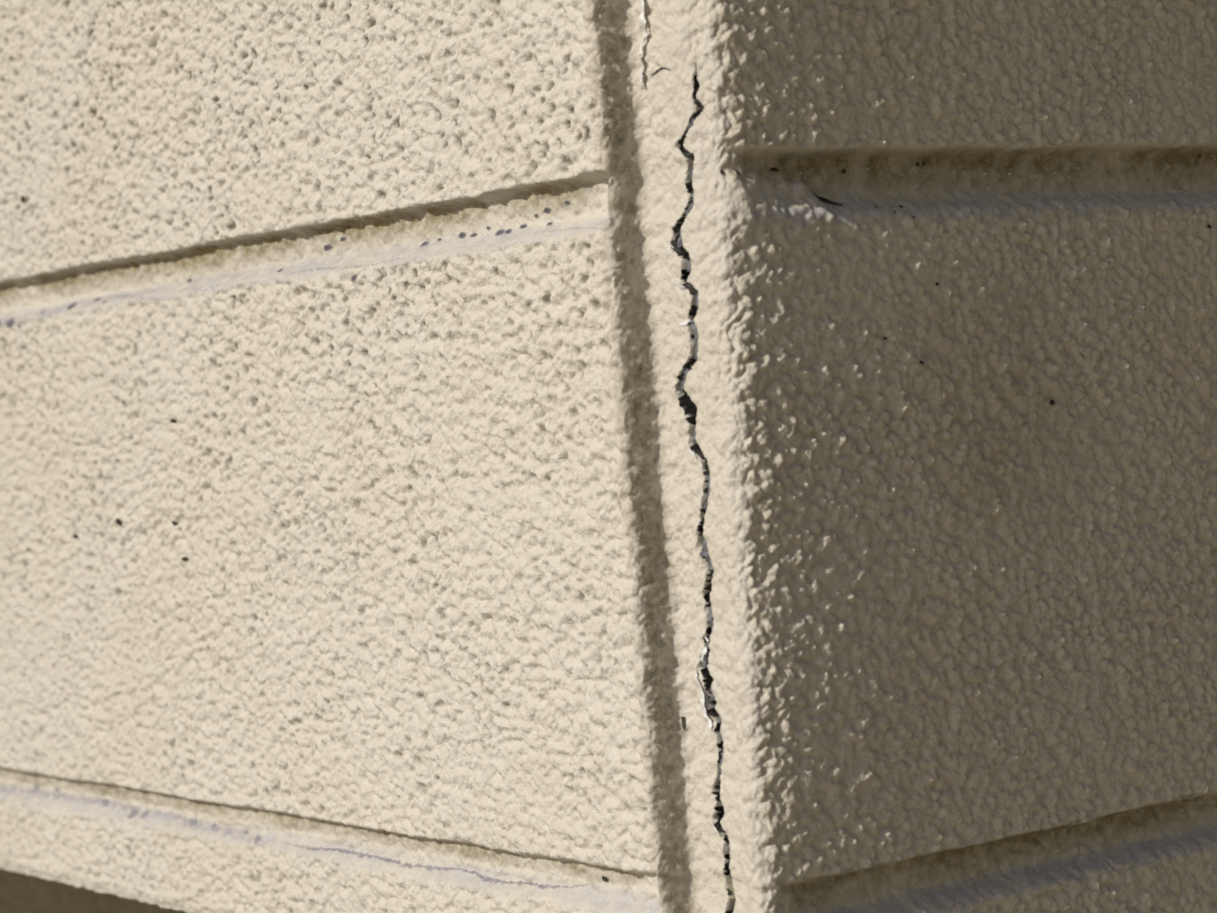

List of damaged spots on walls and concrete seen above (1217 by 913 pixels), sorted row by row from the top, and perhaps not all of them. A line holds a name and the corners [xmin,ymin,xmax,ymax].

crack [666,66,736,913]